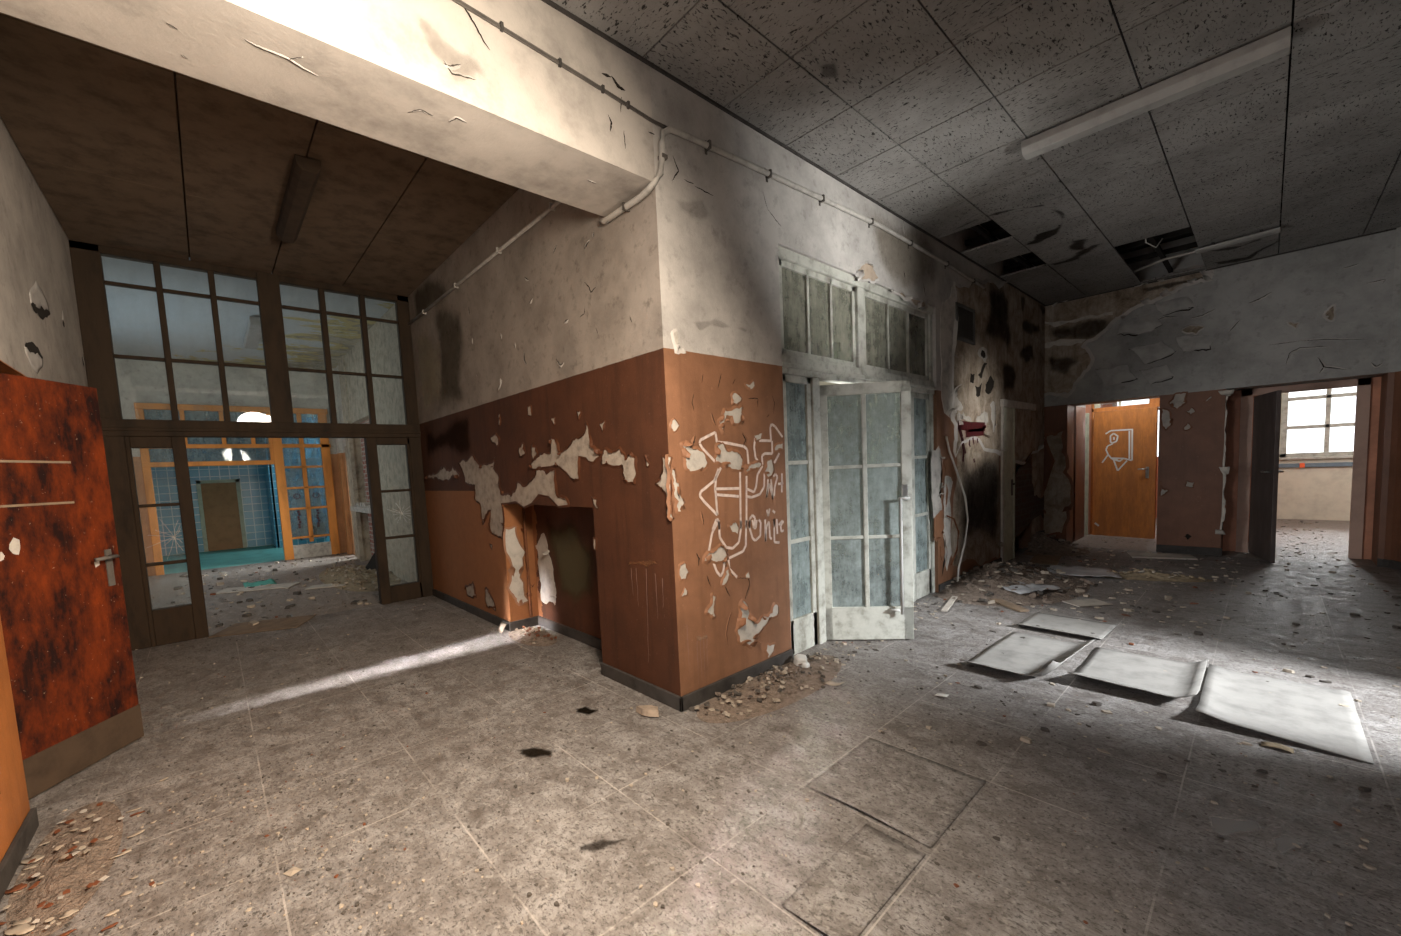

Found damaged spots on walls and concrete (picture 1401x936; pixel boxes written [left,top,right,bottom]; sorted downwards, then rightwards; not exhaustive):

peeling [29,281,64,320]
peeling [24,346,43,374]
water stain [987,292,1105,390]
flaking render [855,261,1215,570]
peeling [425,379,784,633]
water stain [964,462,998,537]
peeling [0,537,20,561]
peeling [735,598,780,659]